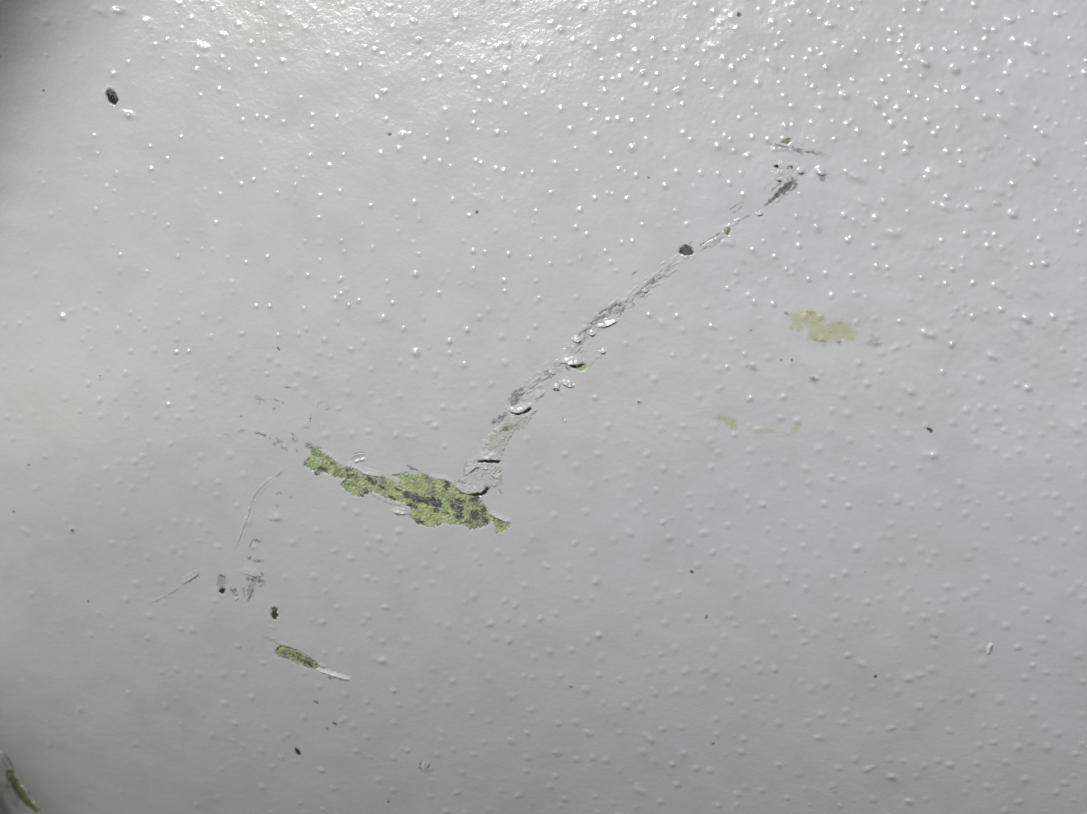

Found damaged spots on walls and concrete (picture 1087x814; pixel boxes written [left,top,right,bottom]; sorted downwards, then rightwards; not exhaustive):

peeling [679,245,695,260]
peeling [548,369,576,391]
peeling [303,444,513,534]
peeling [275,646,351,680]
peeling [0,750,42,814]